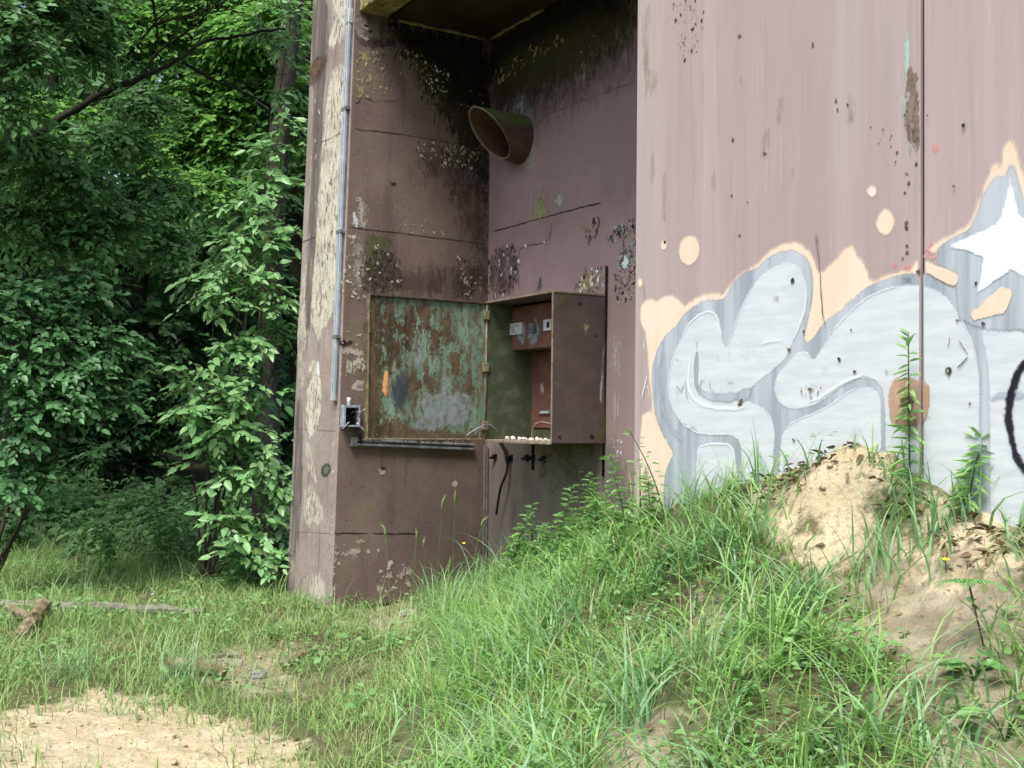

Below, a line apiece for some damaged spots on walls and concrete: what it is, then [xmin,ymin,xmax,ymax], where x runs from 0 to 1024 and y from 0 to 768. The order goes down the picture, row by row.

leakage [380,0,638,301]
corrosion [901,31,920,155]
peeling [297,0,425,605]
corrosion [359,293,484,447]
peeling [488,244,518,299]
peeling [575,218,636,305]